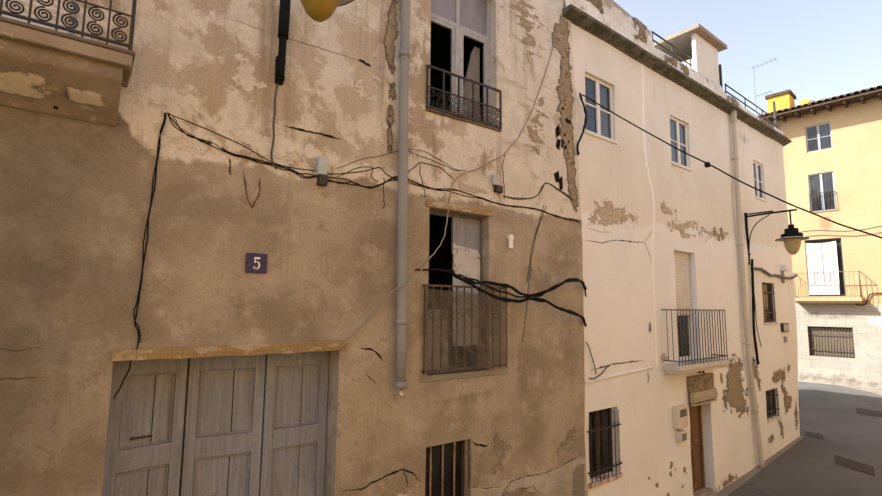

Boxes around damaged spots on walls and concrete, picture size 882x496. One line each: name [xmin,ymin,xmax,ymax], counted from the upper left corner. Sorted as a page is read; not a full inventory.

peeling [0,71,46,100]
peeling [67,86,106,108]
spalling [351,0,399,155]
spalling [500,0,579,213]
peeling [588,198,639,230]
peeling [660,199,729,242]
peeling [720,353,761,419]
peeling [768,365,800,443]
crack [342,469,421,492]